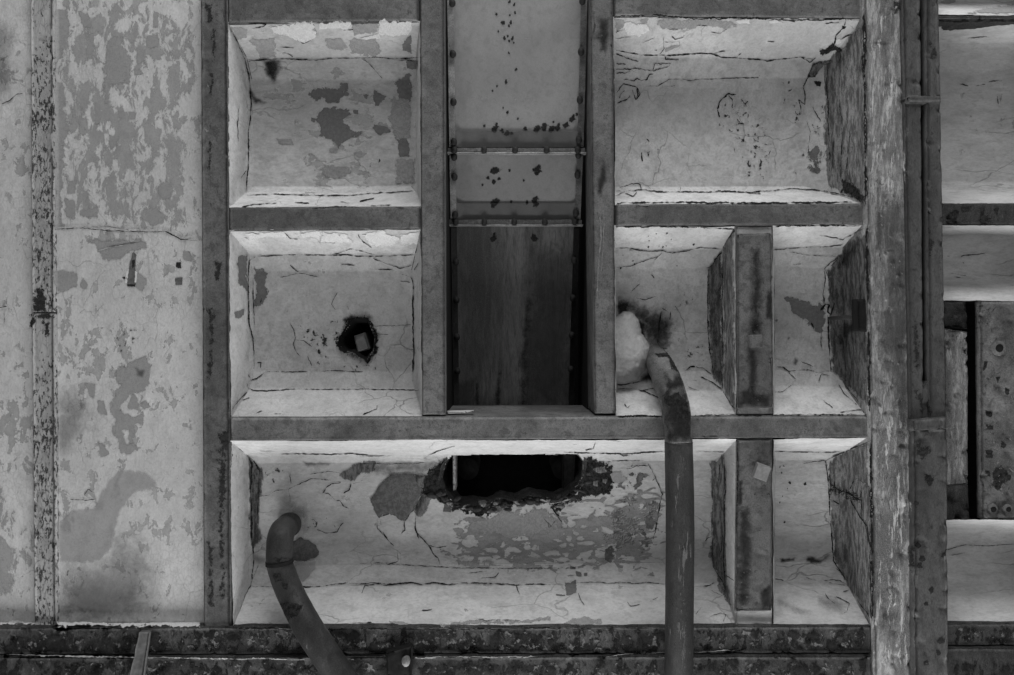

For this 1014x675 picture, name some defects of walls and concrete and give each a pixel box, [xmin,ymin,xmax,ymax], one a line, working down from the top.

peeling [48,0,216,292]
peeling [231,19,418,184]
rust [483,107,578,136]
crack [614,14,859,204]
crack [235,249,418,414]
spalling [335,316,379,364]
crack [616,231,734,408]
peeling [784,235,870,405]
crack [243,446,455,601]
crack [303,490,660,630]
peeling [422,456,666,596]
rust [678,522,692,595]